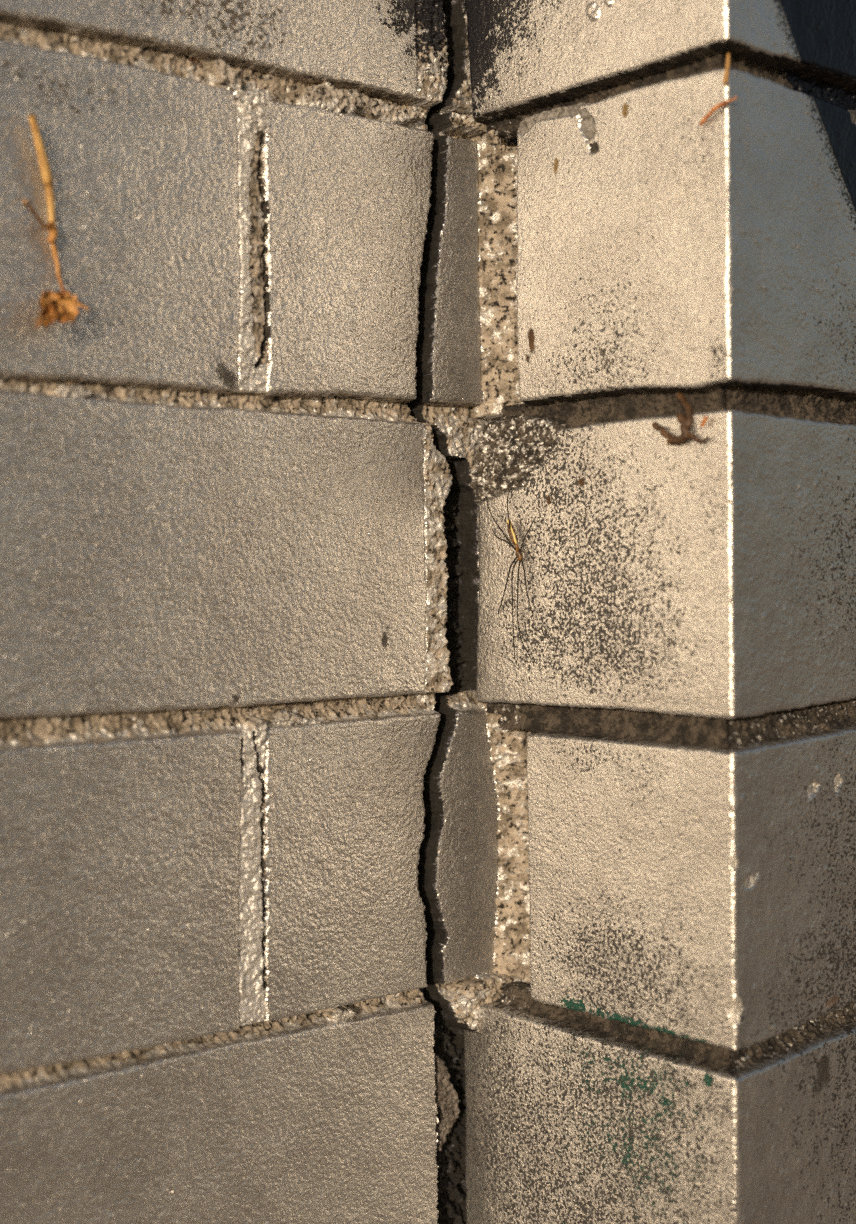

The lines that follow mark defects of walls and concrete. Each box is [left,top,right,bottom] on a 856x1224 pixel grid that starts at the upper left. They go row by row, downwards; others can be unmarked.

crack [254,133,271,368]
crack [406,0,479,1224]